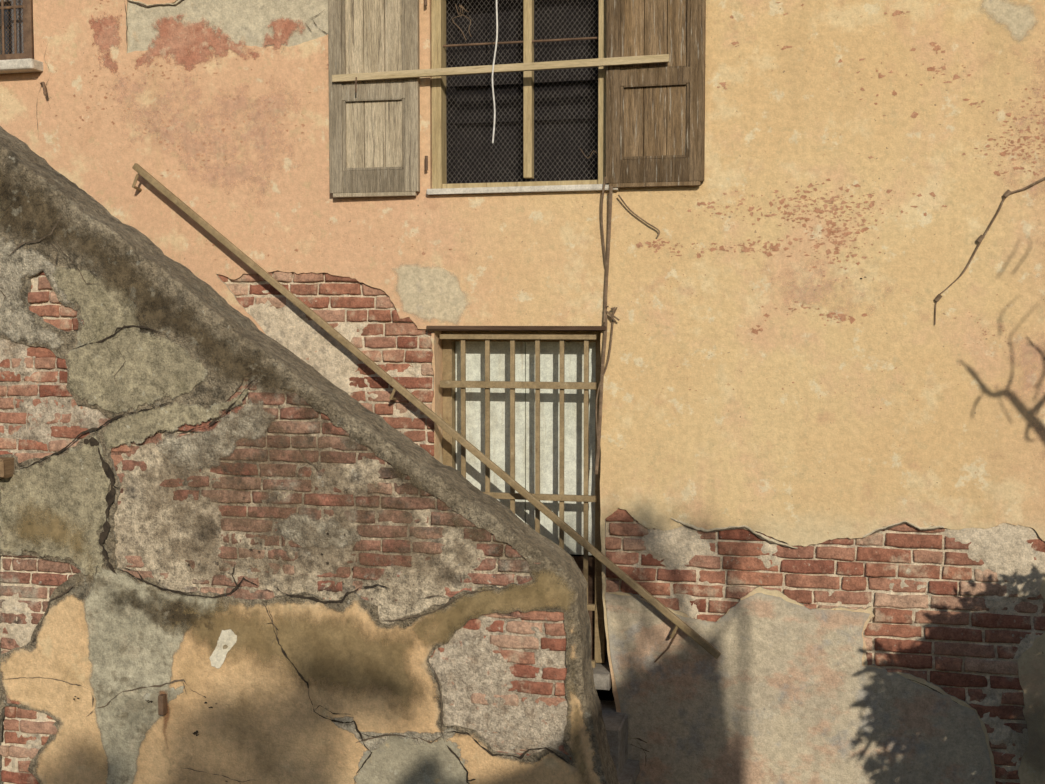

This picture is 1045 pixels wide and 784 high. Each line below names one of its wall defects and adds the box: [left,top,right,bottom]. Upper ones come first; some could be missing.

spalling [54,0,328,182]
peeling [920,42,973,86]
flaking render [0,337,111,463]
flaking render [28,272,84,331]
crack [72,325,162,389]
crack [178,378,257,434]
peeling [217,232,468,457]
flaking render [111,379,540,624]
flaking render [0,555,81,654]
crack [0,401,577,784]
flaking render [602,508,1045,784]
flaking render [0,696,58,784]